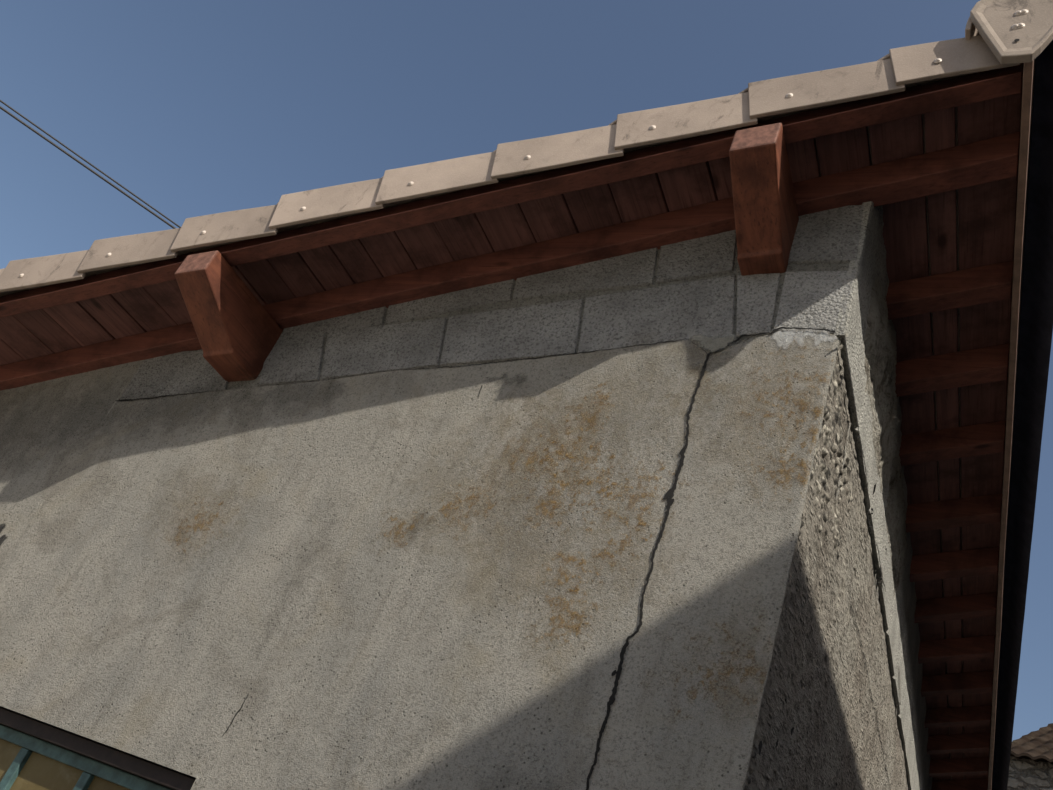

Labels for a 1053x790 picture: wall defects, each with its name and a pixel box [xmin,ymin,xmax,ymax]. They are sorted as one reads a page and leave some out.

crack [116,391,206,402]
corrosion [505,382,693,641]
crack [409,327,887,790]